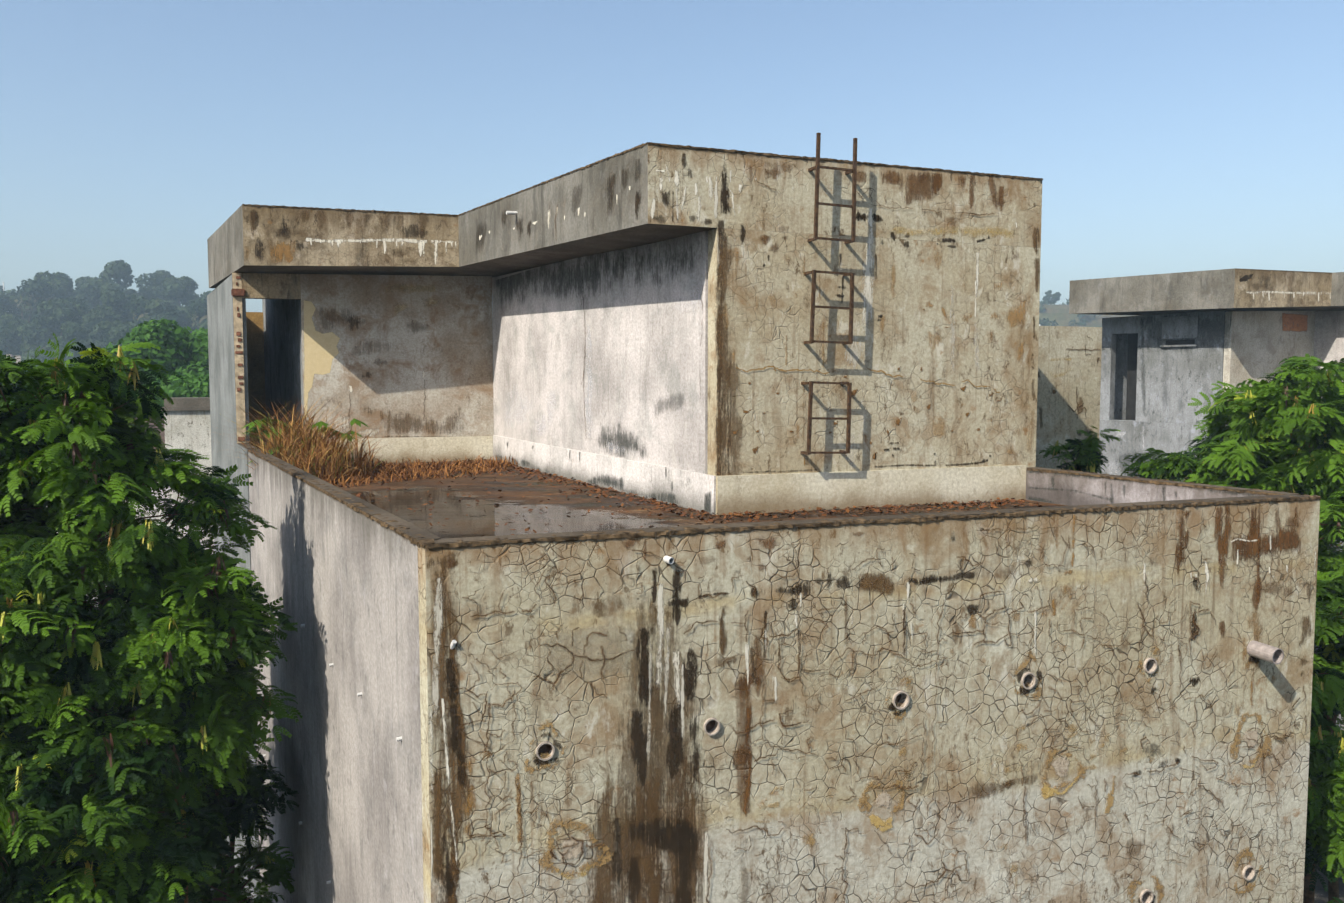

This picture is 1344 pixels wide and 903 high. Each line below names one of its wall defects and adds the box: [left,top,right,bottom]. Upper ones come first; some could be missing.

leakage [513,207,586,237]
leakage [497,247,693,306]
leakage [607,153,756,476]
leakage [598,430,644,456]
leakage [875,459,988,467]
corrosion [1175,510,1190,571]
corrosion [1215,505,1301,610]
leakage [776,581,810,668]
leakage [827,572,974,638]
leakage [427,553,473,903]
leakage [597,568,777,903]
crack [454,510,1307,903]